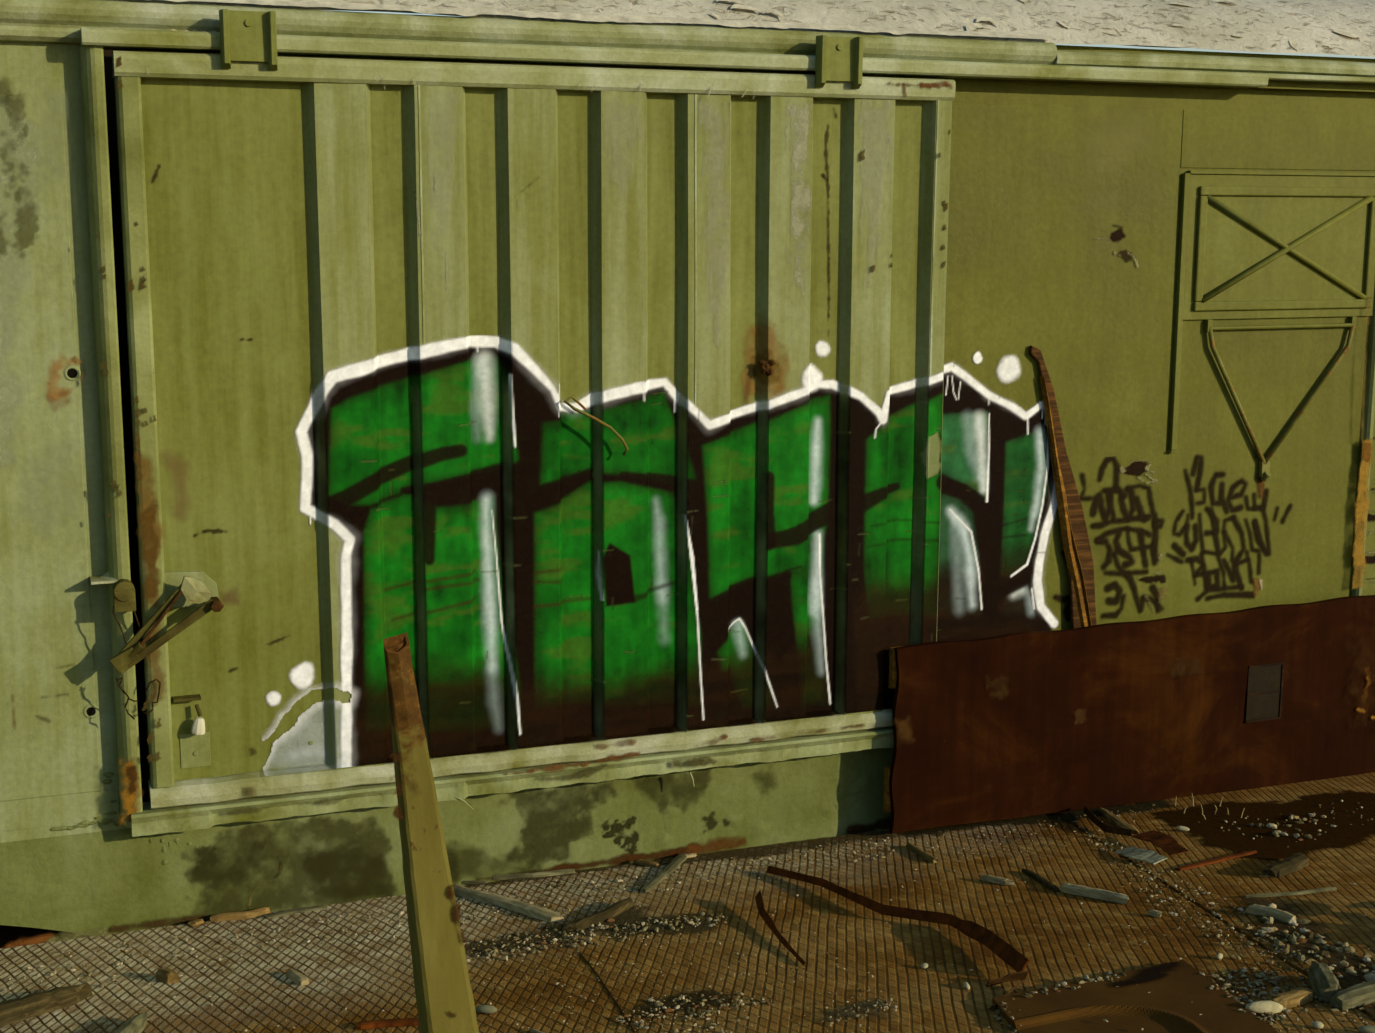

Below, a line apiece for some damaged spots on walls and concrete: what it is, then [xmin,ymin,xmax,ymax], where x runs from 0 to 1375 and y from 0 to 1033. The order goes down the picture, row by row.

corrosion [745,327,783,395]
corrosion [135,431,162,606]
corrosion [1353,439,1372,588]
damp [193,818,396,919]
damp [447,783,639,879]
damp [638,768,709,809]
damp [703,812,729,832]